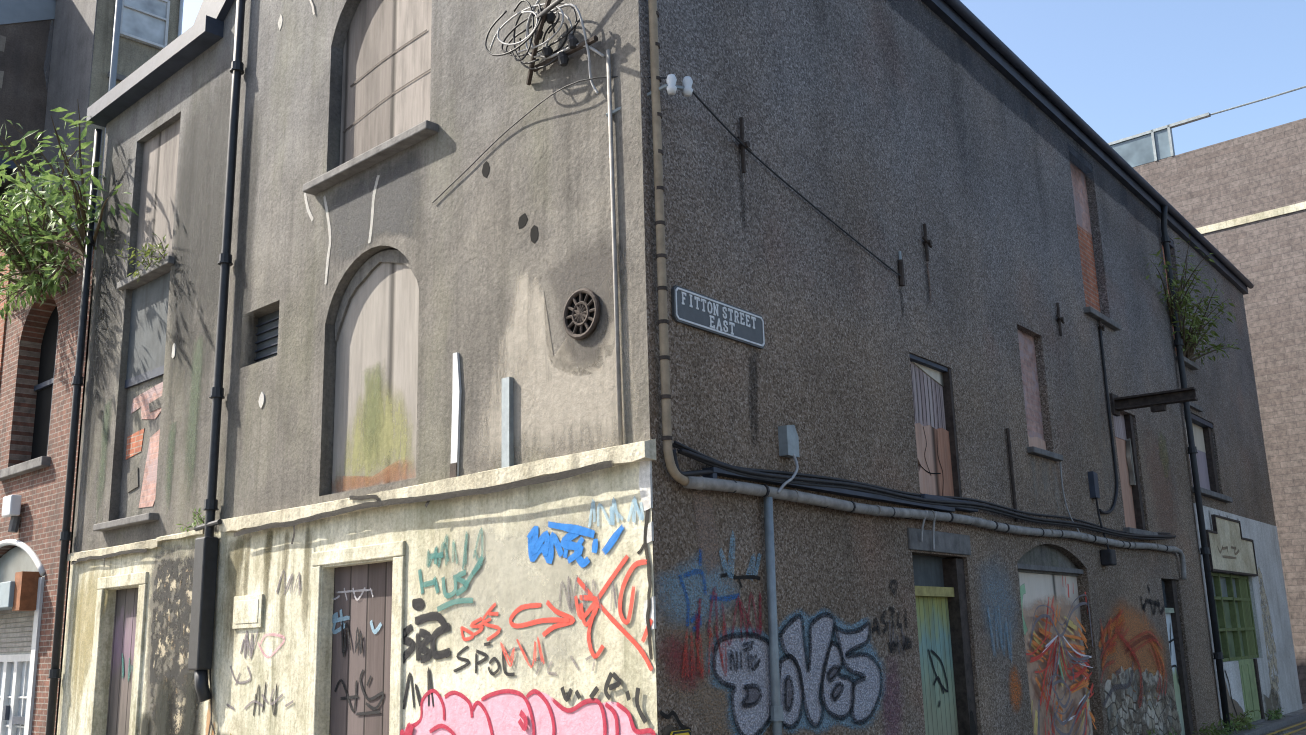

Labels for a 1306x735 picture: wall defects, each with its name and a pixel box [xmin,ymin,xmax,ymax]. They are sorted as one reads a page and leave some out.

water stain [138,671,196,735]